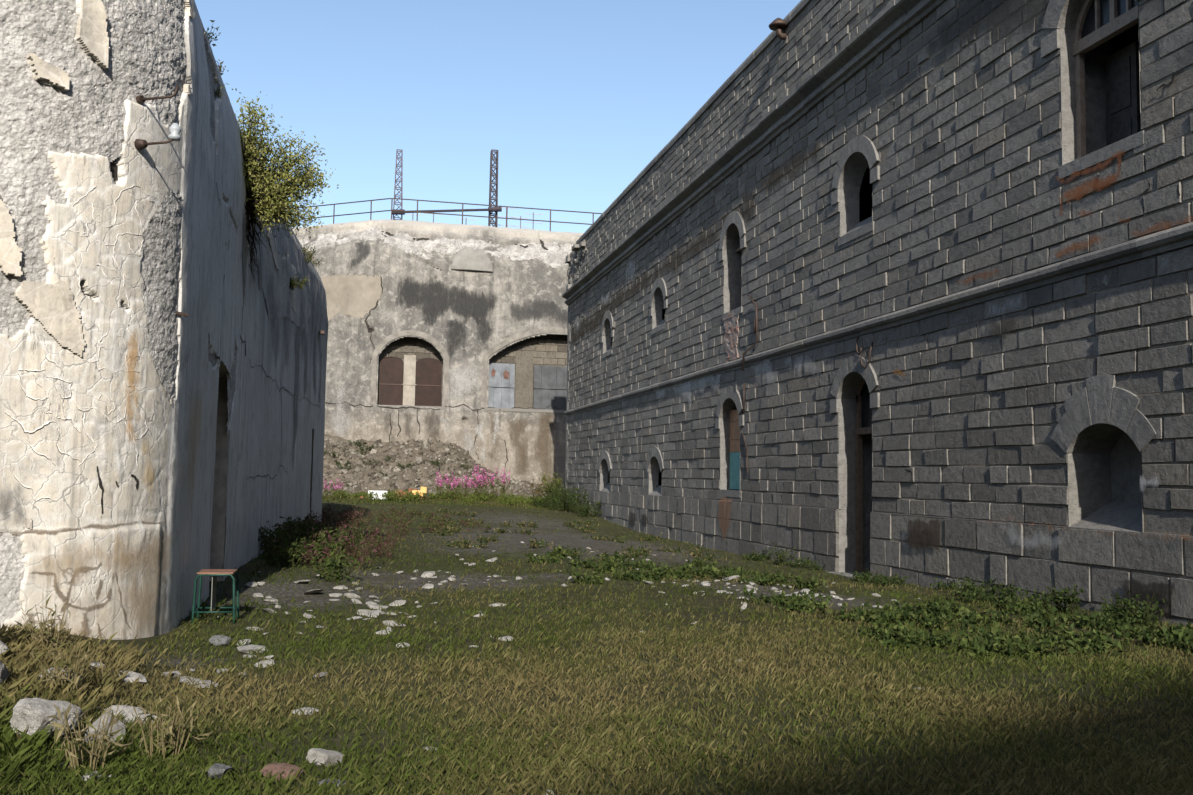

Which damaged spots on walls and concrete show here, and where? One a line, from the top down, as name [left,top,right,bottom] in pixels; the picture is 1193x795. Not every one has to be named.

spalling [0,0,196,357]
rust [1057,151,1124,215]
crack [0,159,160,535]
spalling [140,189,183,404]
spalling [208,347,236,436]
crack [208,239,560,524]
damp [398,279,496,354]